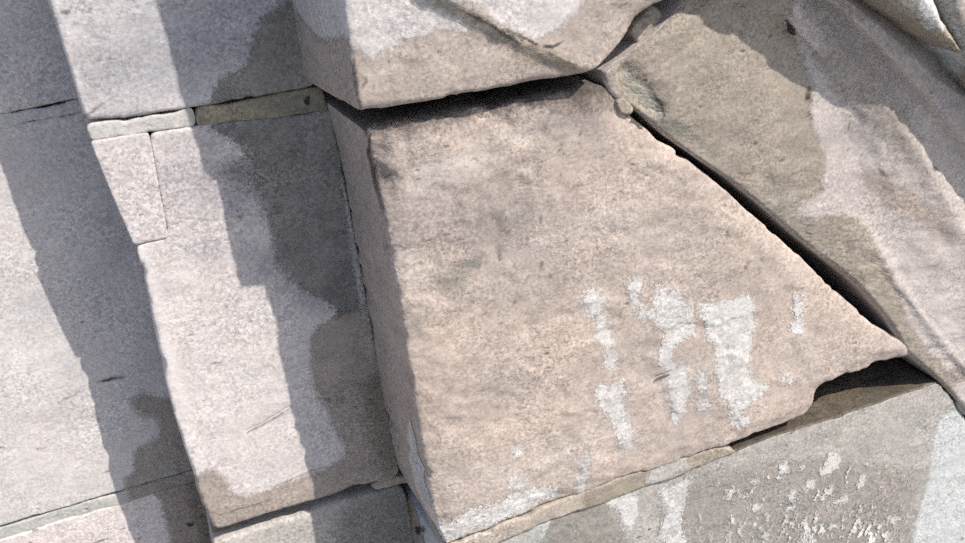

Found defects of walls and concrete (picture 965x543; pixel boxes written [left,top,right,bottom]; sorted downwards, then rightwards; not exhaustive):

leakage [126,110,398,543]
leakage [209,0,965,543]